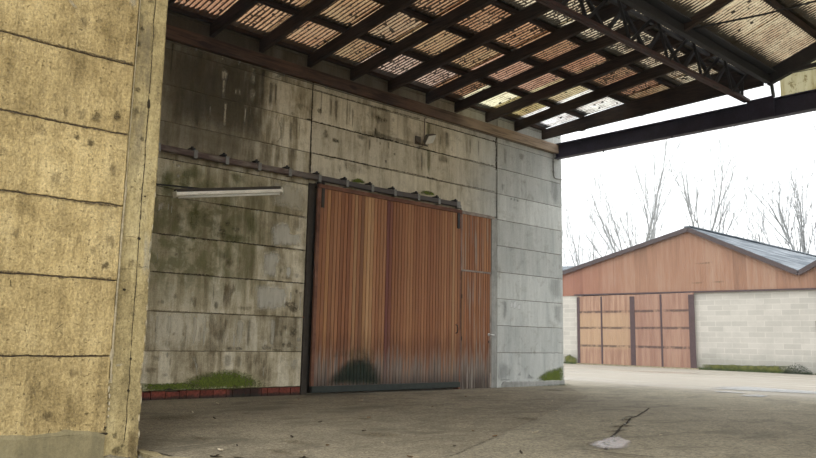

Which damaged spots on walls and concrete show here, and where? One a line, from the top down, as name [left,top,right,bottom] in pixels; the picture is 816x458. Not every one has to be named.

damp [315,89,493,166]